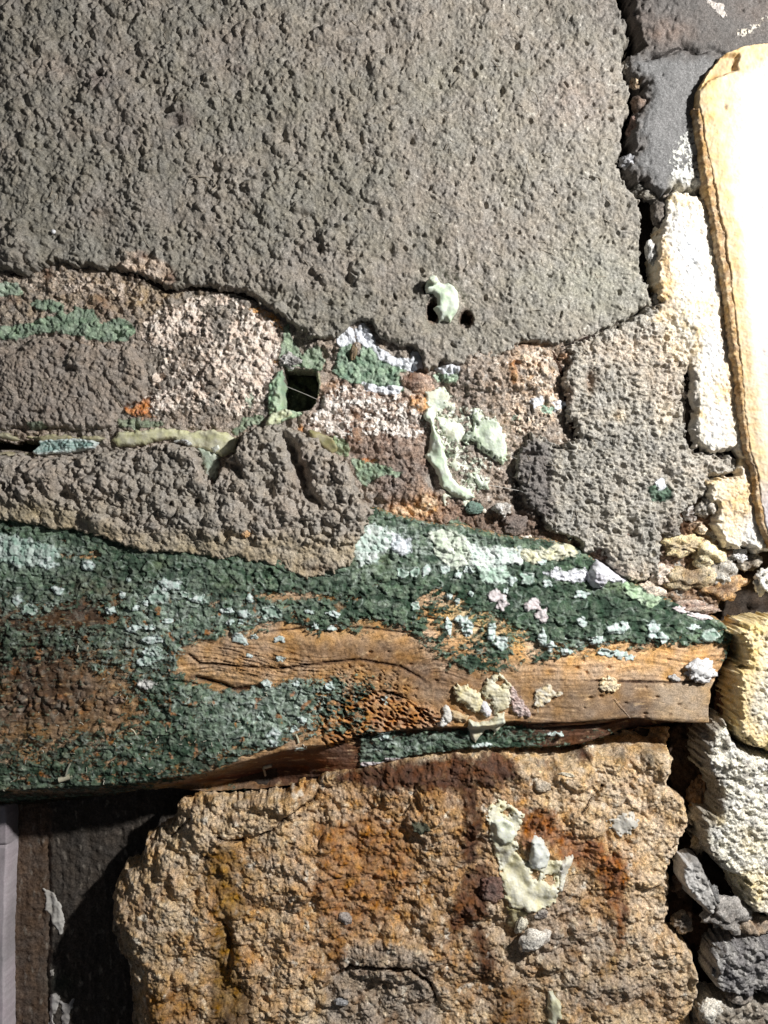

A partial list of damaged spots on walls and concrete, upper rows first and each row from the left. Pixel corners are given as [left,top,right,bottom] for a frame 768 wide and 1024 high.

crack [616,0,710,64]
crack [616,96,633,171]
crack [635,197,655,283]
crack [114,265,258,303]
spalling [423,285,438,322]
spalling [279,351,319,412]
spalling [0,441,40,452]
rust [311,813,414,972]
rust [516,807,630,944]